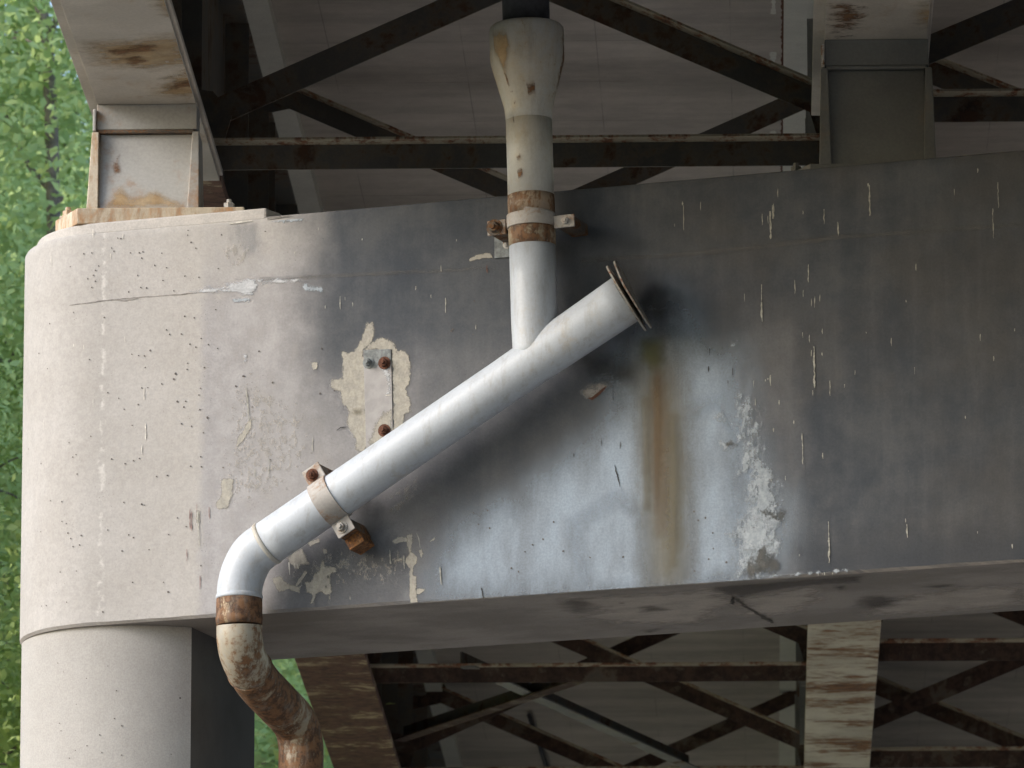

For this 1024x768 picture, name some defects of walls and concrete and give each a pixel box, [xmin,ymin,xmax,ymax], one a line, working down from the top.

corrosion [833,5,866,37]
corrosion [101,40,192,94]
corrosion [112,192,174,207]
crack [69,292,199,306]
peeling [331,322,411,451]
leakage [435,302,786,599]
corrosion [643,344,683,576]
peeling [273,539,336,604]
peeling [389,533,435,603]